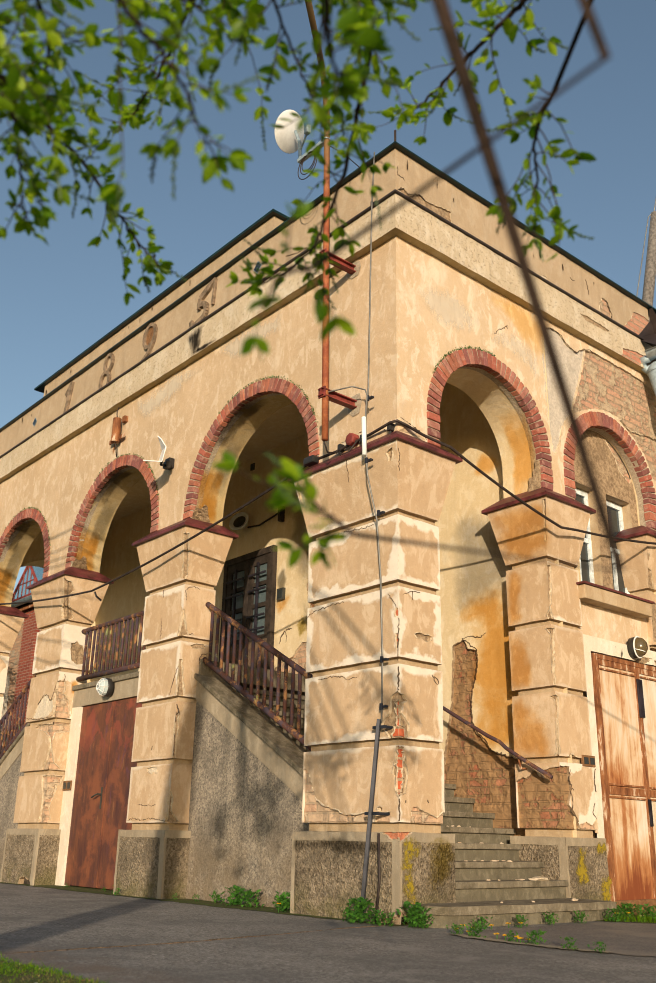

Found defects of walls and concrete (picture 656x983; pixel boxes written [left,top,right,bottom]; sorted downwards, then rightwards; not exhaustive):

flaking render [624,312,649,335]
flaking render [542,327,656,484]
flaking render [528,460,547,542]
crack [388,591,420,690]
flaking render [414,632,433,642]
flaking render [32,680,71,823]
flaking render [302,769,443,842]
flaking render [381,690,410,798]
crack [462,633,513,759]
flaking render [444,564,598,836]